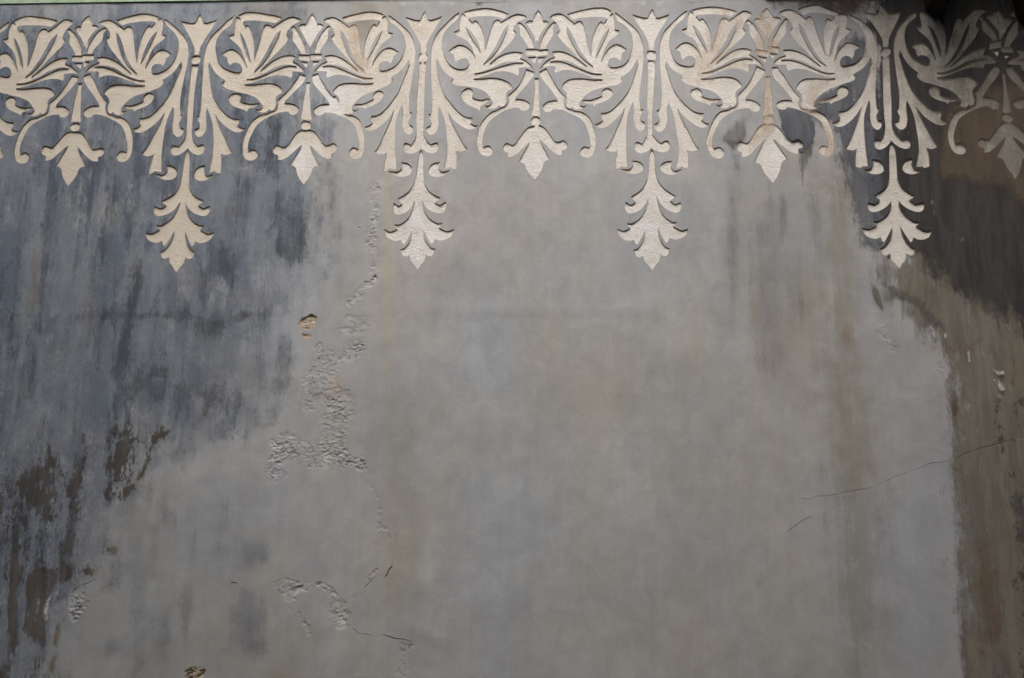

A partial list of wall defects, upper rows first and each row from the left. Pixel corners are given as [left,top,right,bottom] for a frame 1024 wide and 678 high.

leakage [939,74,1024,202]
leakage [0,3,306,678]
spalling [263,314,368,486]
leakage [872,238,1024,678]
spalling [269,568,379,638]